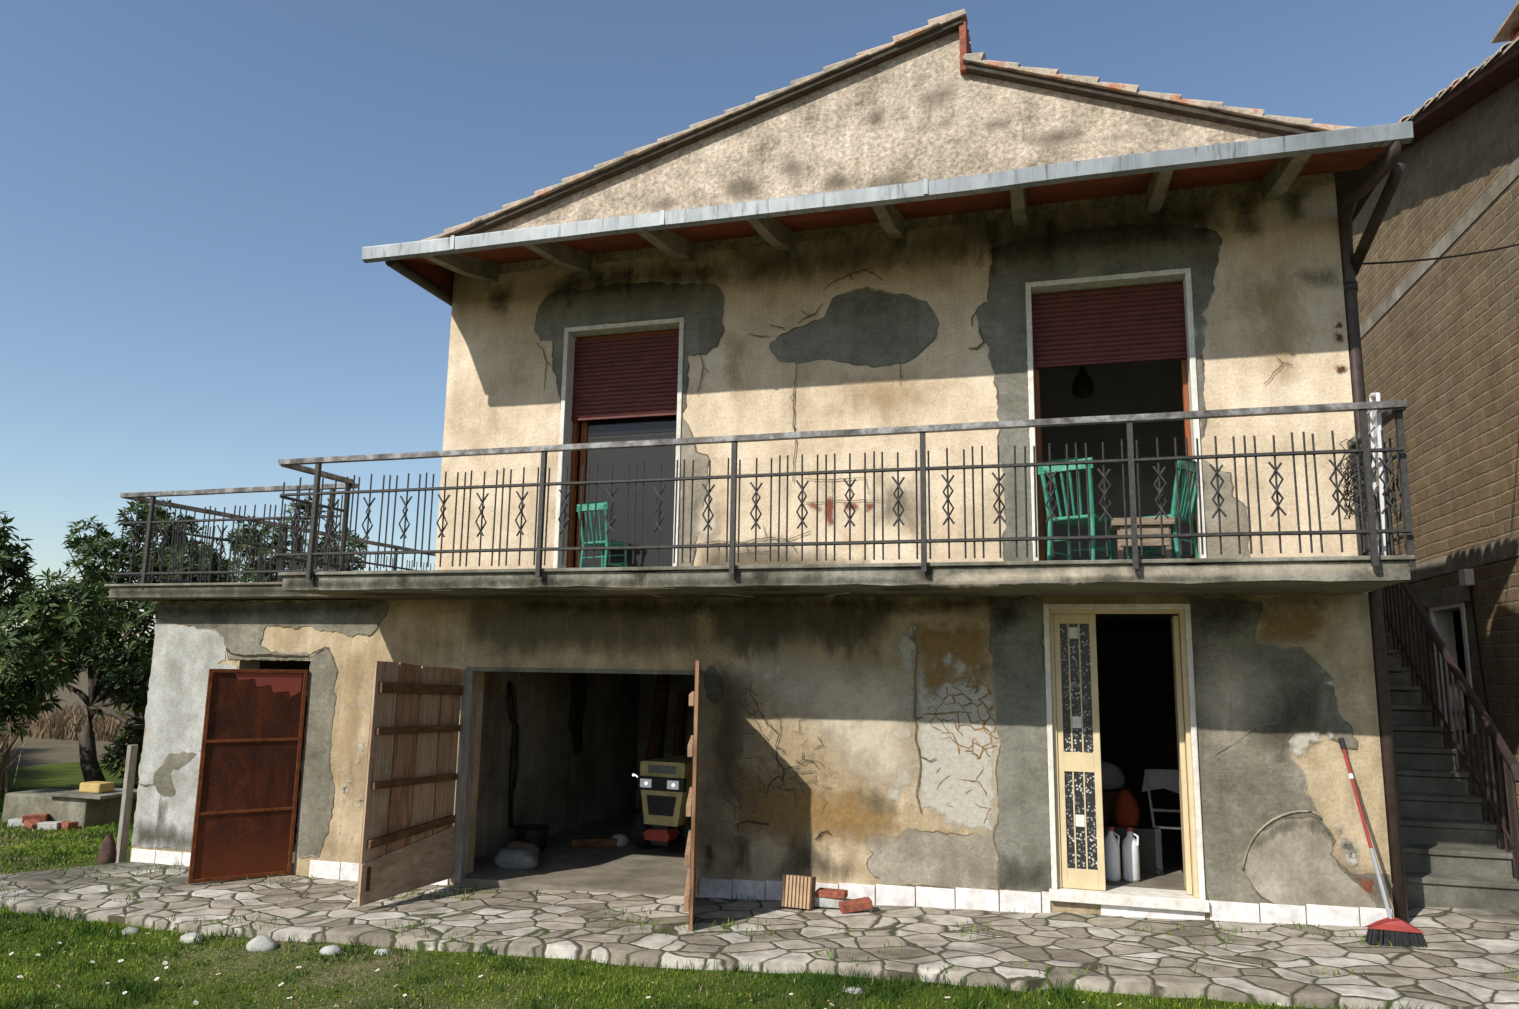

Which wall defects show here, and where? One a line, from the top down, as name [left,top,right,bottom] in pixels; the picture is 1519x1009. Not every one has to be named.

flaking render [131,621,238,851]
crack [721,680,833,840]
peeling [874,625,996,831]
spalling [1289,732,1333,756]
spalling [1336,824,1358,865]